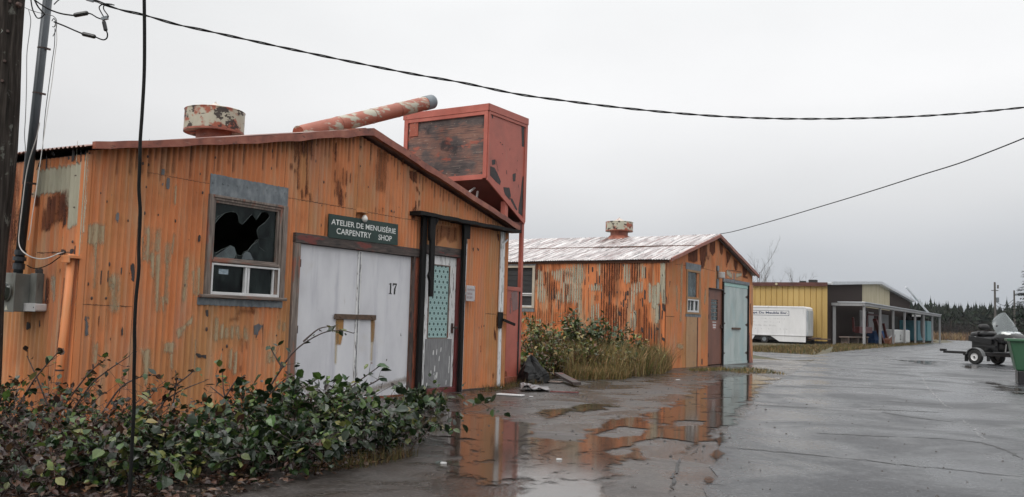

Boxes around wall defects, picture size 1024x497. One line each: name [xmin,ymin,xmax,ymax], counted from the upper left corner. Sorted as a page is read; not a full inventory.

corrosion [334,143,351,206]
corrosion [35,192,68,231]
peeling [32,142,174,311]
corrosion [530,264,578,323]
peeling [536,263,683,342]
corrosion [601,263,658,348]
peeling [205,310,276,374]